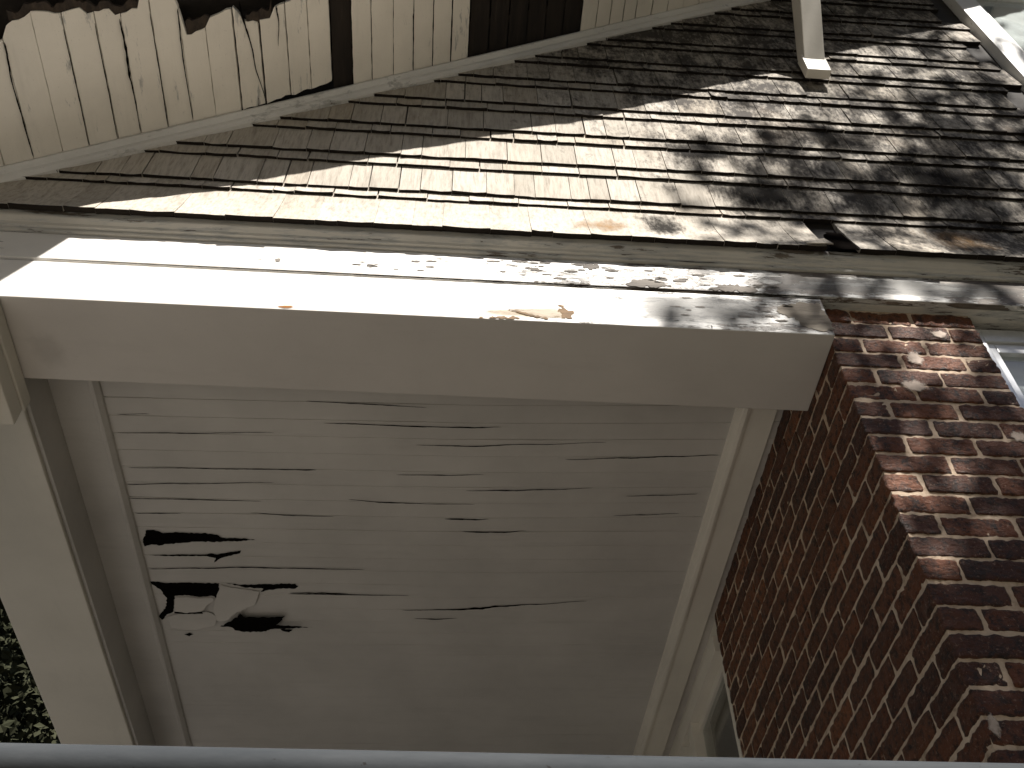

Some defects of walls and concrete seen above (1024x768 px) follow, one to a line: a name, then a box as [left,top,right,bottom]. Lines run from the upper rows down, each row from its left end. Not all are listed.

crack [4,43,33,155]
crack [95,19,141,139]
crack [150,9,193,124]
peeling [486,260,619,285]
peeling [626,270,777,292]
peeling [558,304,574,319]
peeling [730,301,836,332]
crack [309,401,707,460]
crack [126,468,332,517]
peeling [143,530,254,546]
peeling [151,582,308,636]
crack [155,551,579,620]